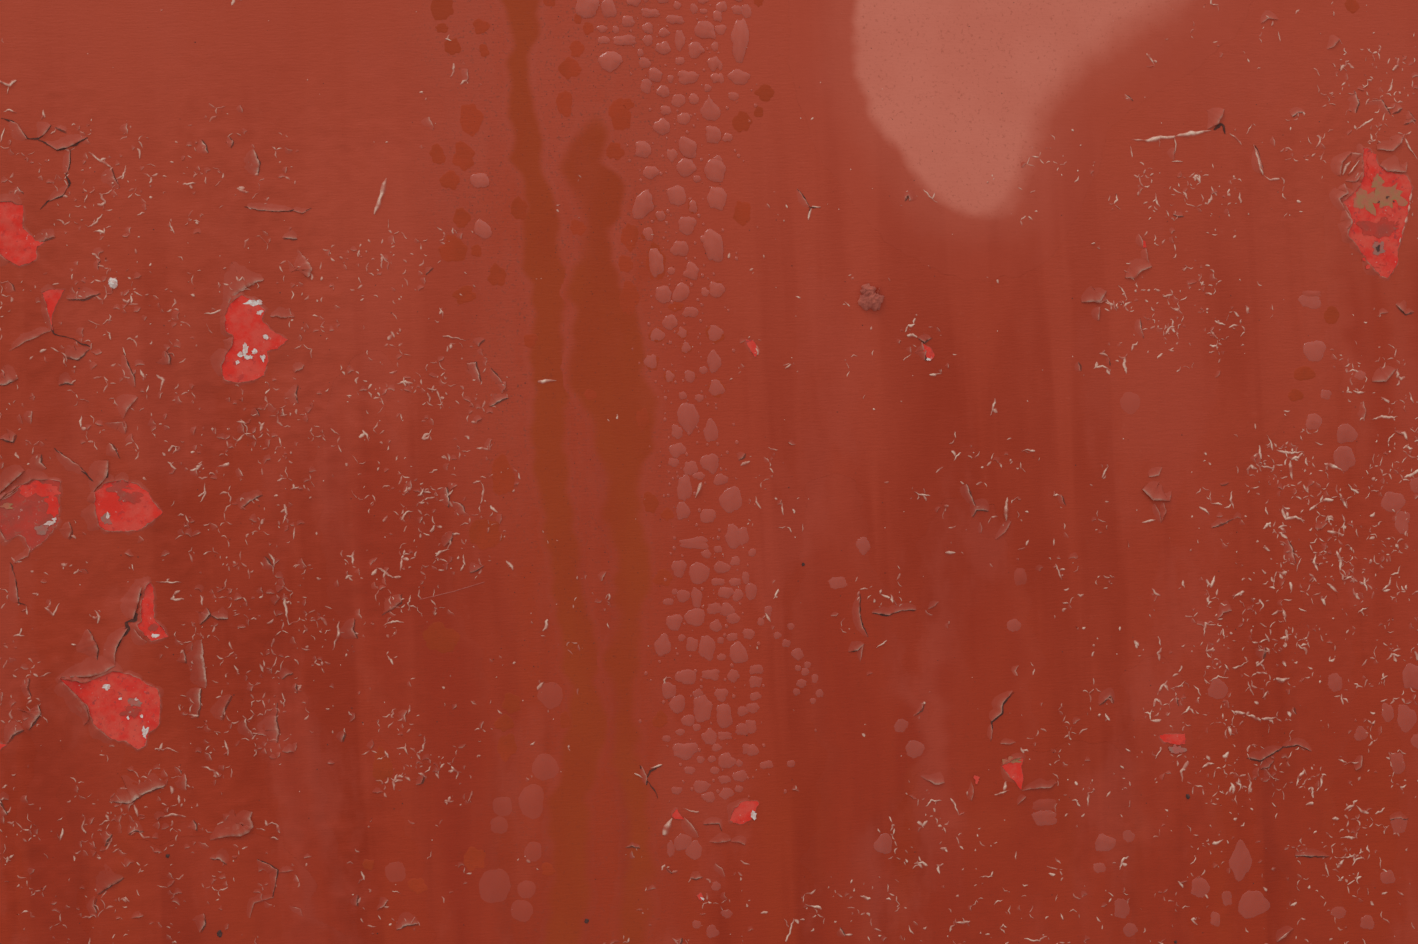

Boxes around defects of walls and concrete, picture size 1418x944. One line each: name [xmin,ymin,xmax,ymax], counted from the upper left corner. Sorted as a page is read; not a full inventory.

peeling [1234,32,1418,281]
peeling [896,314,957,376]
peeling [0,104,625,944]
damp [314,351,522,944]
damp [429,0,727,944]
peeling [910,432,1040,555]
peeling [995,344,1418,944]
damp [14,633,377,944]
peeling [662,860,768,942]
peeling [727,798,760,825]
peeling [784,876,926,942]
peeling [878,772,1130,944]